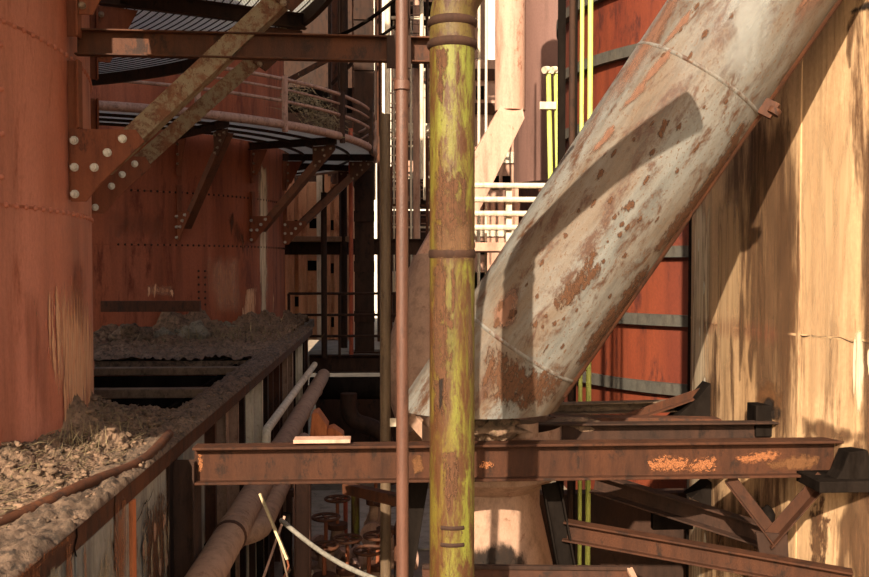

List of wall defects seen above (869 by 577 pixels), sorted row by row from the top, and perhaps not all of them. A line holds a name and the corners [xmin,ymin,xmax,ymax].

peeling [45,275,94,421]
peeling [692,205,709,390]
crack [799,334,868,344]
damp [853,144,869,453]